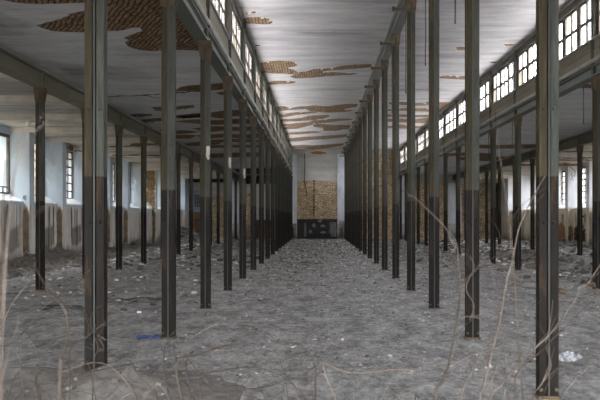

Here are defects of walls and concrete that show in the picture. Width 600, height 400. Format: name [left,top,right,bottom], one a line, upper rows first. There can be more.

flaking render [37,11,84,32]
flaking render [107,0,161,51]
flaking render [176,15,199,51]
flaking render [241,11,274,25]
flaking render [260,60,373,85]
flaking render [131,107,161,123]
flaking render [176,105,259,168]
flaking render [276,103,359,150]
leakage [3,206,29,256]
leakage [45,207,62,248]
leakage [71,209,82,245]